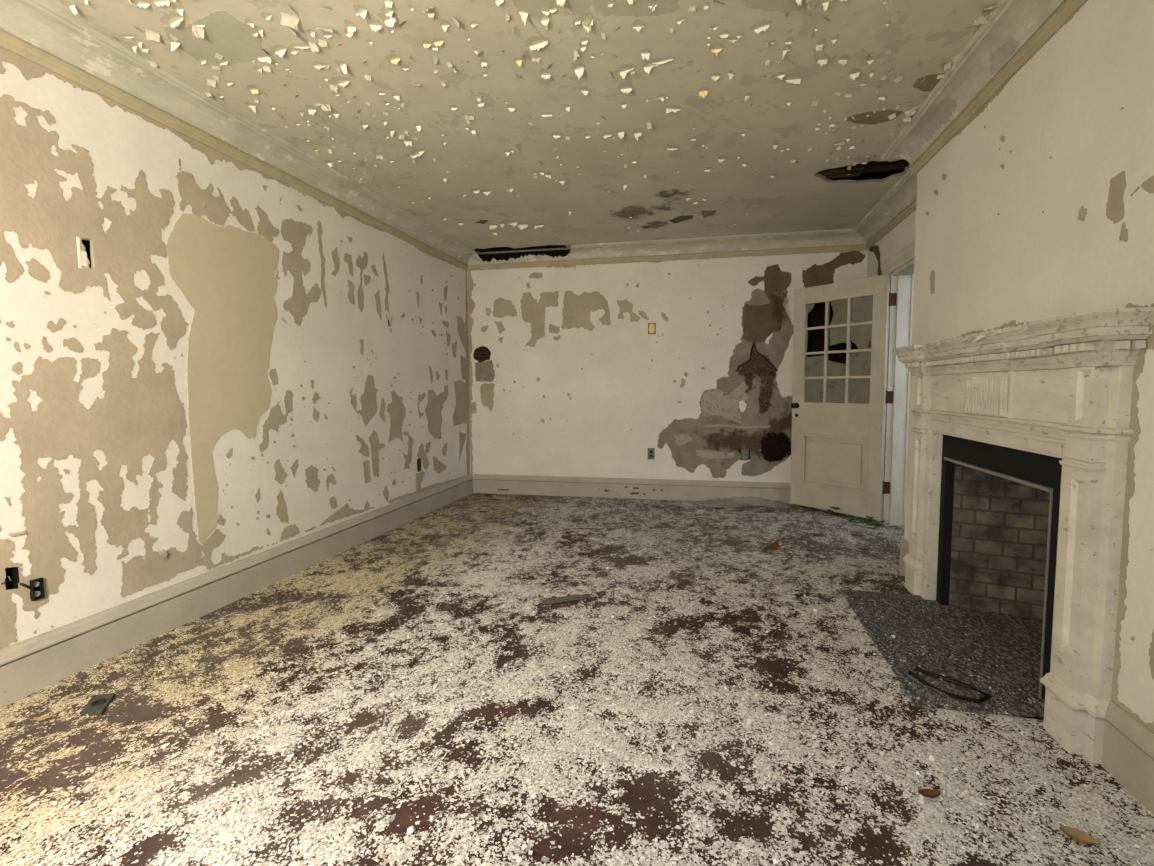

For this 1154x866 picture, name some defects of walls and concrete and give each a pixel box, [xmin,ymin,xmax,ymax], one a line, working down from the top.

peeling [59,0,89,15]
peeling [494,0,735,109]
peeling [111,0,488,188]
peeling [645,94,682,114]
peeling [944,83,1007,146]
peeling [681,120,796,178]
spalling [669,197,708,223]
peeling [1077,206,1087,221]
peeling [1106,171,1154,242]
peeling [0,47,669,649]
flaking render [657,245,882,478]